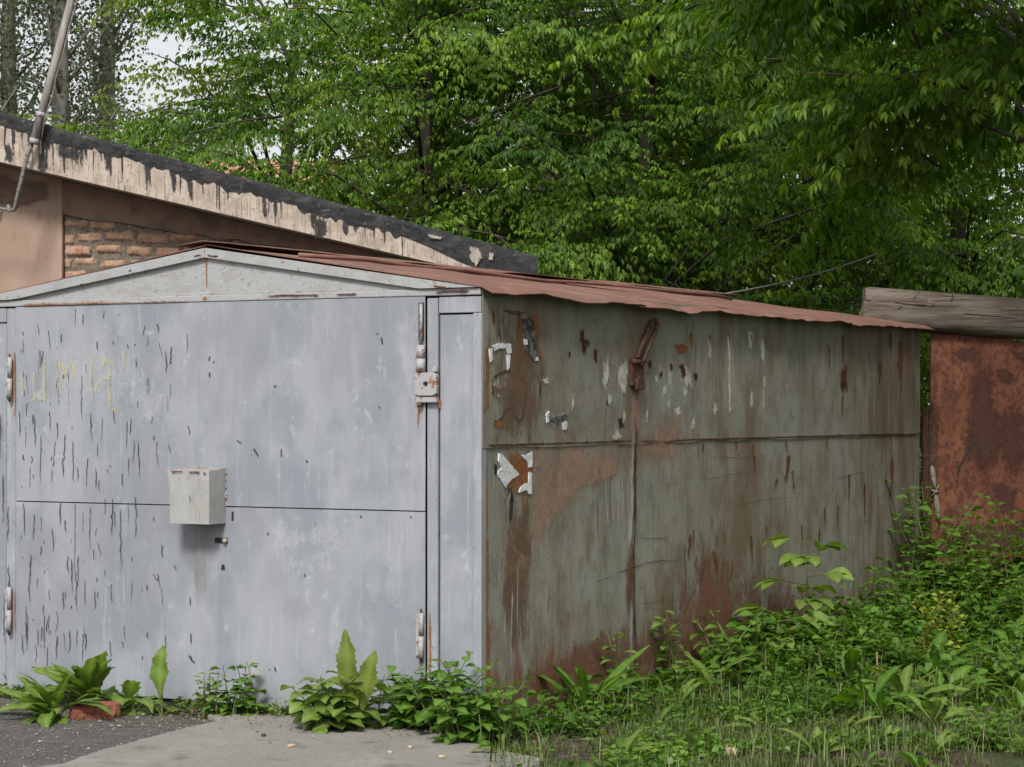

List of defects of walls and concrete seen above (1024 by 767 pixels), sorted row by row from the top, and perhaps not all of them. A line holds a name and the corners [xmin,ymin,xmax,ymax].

damp [0,176,47,221]
peeling [602,352,629,406]
peeling [655,366,693,416]
rust [828,334,847,410]
peeling [492,411,644,650]
rust [485,309,656,693]
rust [676,433,916,493]
rust [938,366,1024,552]
rust [497,517,859,723]